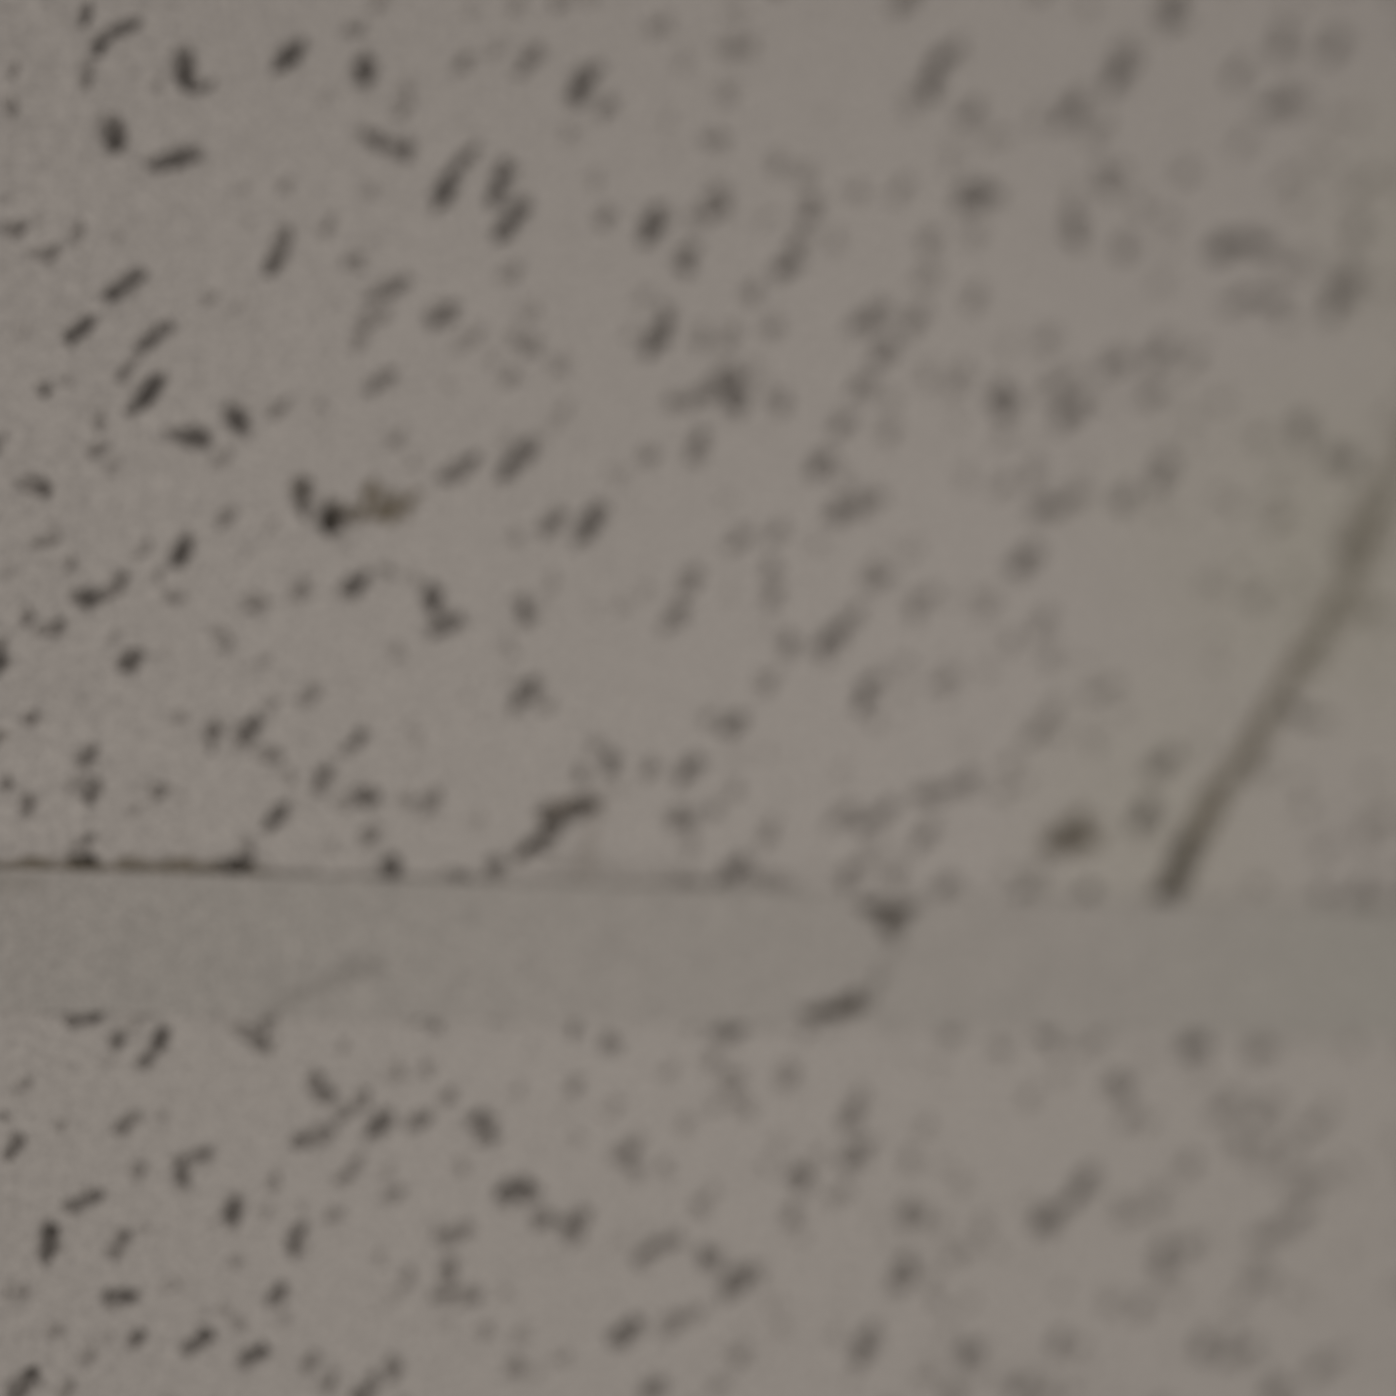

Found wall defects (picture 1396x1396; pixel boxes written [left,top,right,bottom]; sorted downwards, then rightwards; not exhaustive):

crack [1152,672,1291,901]